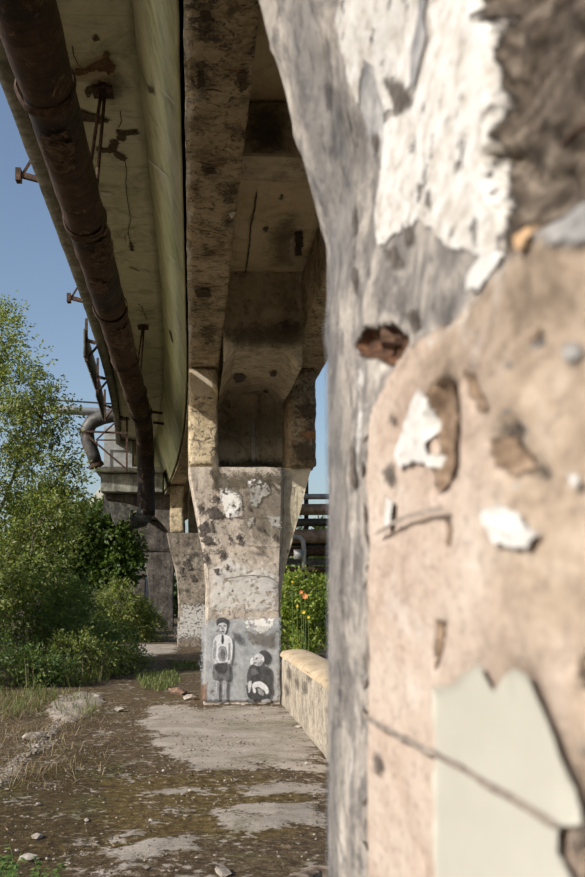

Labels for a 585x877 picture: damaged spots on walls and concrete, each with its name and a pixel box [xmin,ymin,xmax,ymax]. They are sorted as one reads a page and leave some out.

peeling [335,0,585,291]
spalling [382,370,488,492]
peeling [177,478,282,639]
flaking render [384,497,392,530]
flaking render [480,504,538,549]